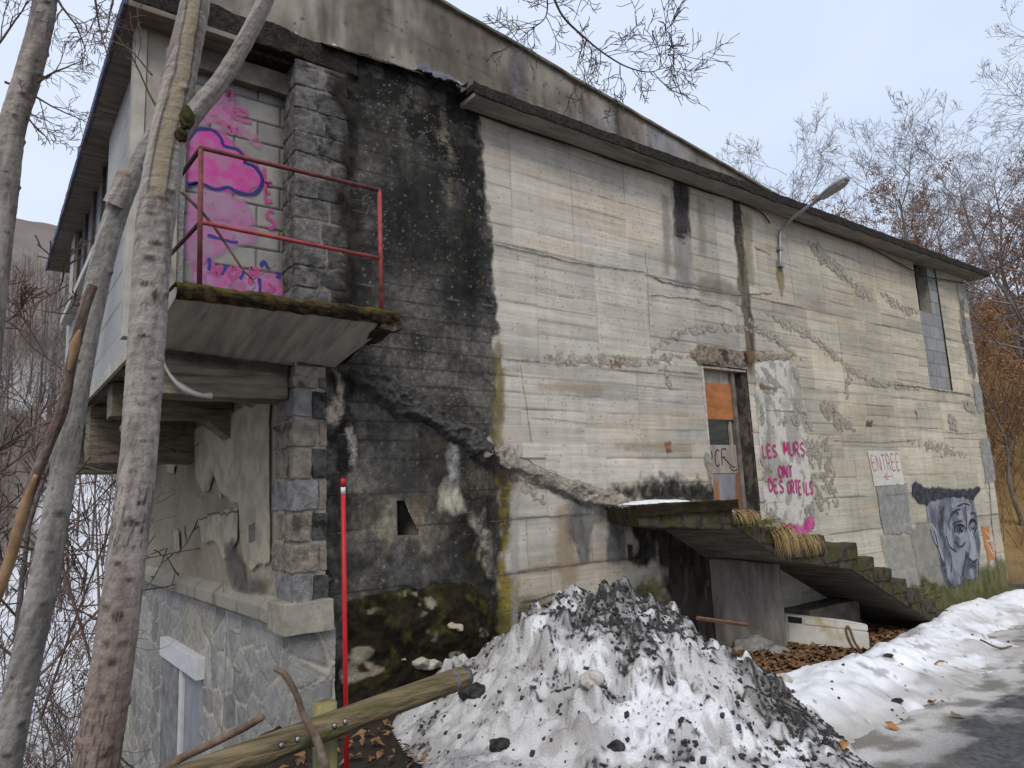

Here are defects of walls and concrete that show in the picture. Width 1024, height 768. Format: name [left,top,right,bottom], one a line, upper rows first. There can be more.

flaking render [194,404,270,570]
leakage [165,0,520,709]
crack [490,365,608,522]
crack [491,243,772,323]
leakage [663,181,755,351]
spalling [753,350,799,402]